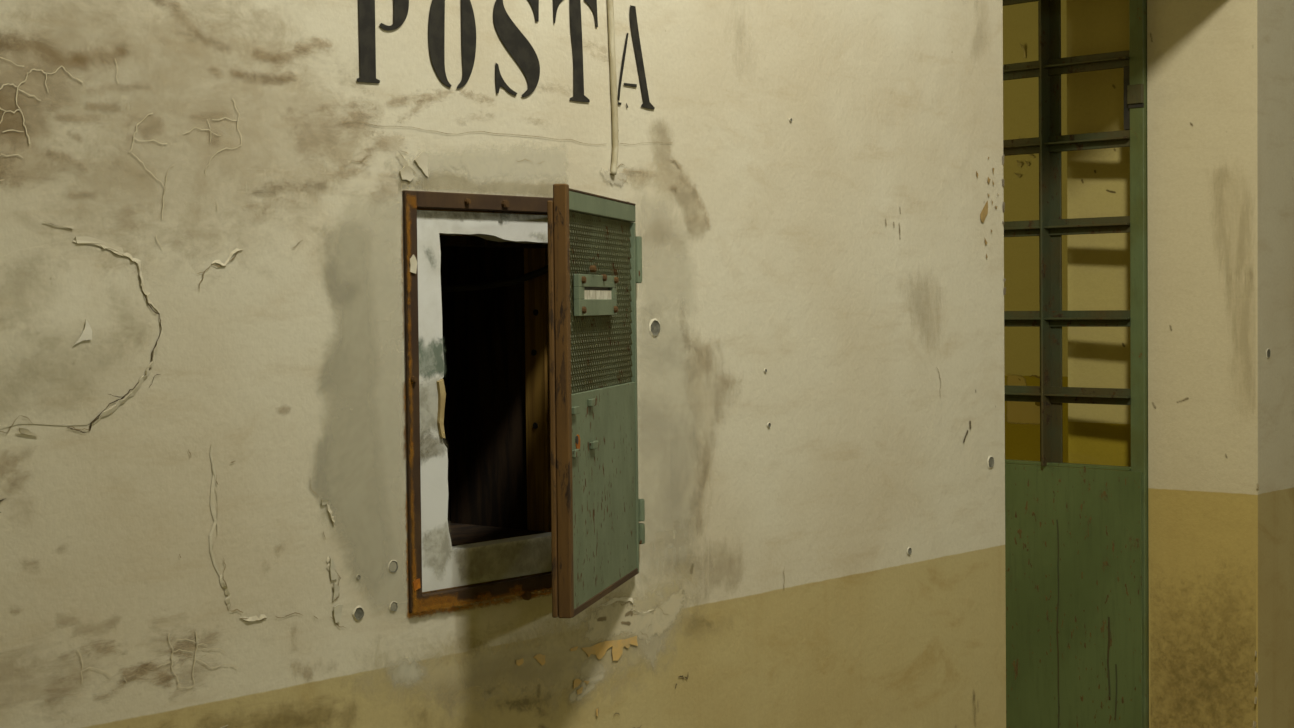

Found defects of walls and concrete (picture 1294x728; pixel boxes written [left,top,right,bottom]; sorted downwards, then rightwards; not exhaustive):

crack [0,57,83,181]
crack [67,98,243,433]
crack [219,476,345,628]
spalling [570,564,694,661]